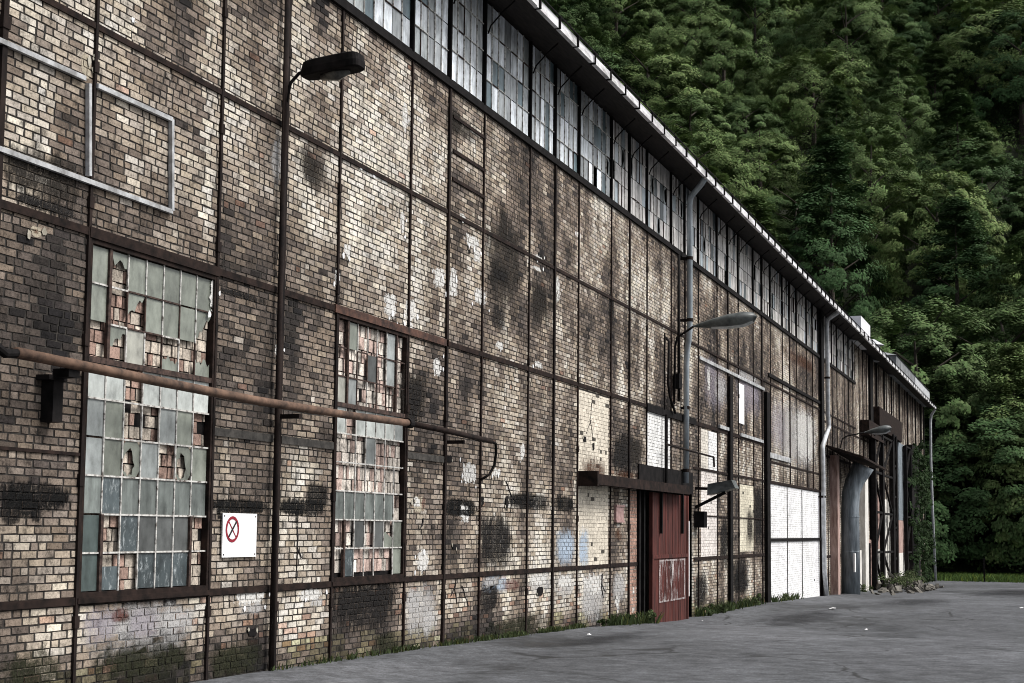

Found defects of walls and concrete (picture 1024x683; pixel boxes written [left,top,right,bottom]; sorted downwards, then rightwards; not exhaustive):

water stain [295,146,326,192]
water stain [485,210,519,329]
rust [338,320,405,418]